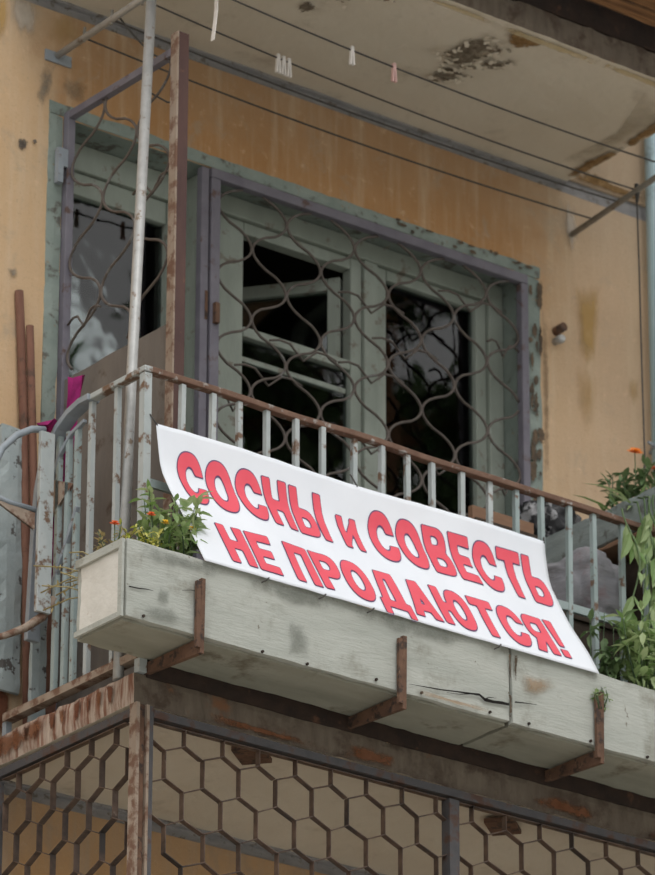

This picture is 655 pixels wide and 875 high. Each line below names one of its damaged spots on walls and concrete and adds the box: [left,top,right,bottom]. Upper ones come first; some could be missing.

peeling [298,0,329,12]
peeling [428,34,541,85]
corrosion [569,123,655,177]
peeling [529,280,543,309]
peeling [529,323,543,416]
peeling [530,428,545,482]
corrosion [0,685,113,756]
crack [411,684,536,706]